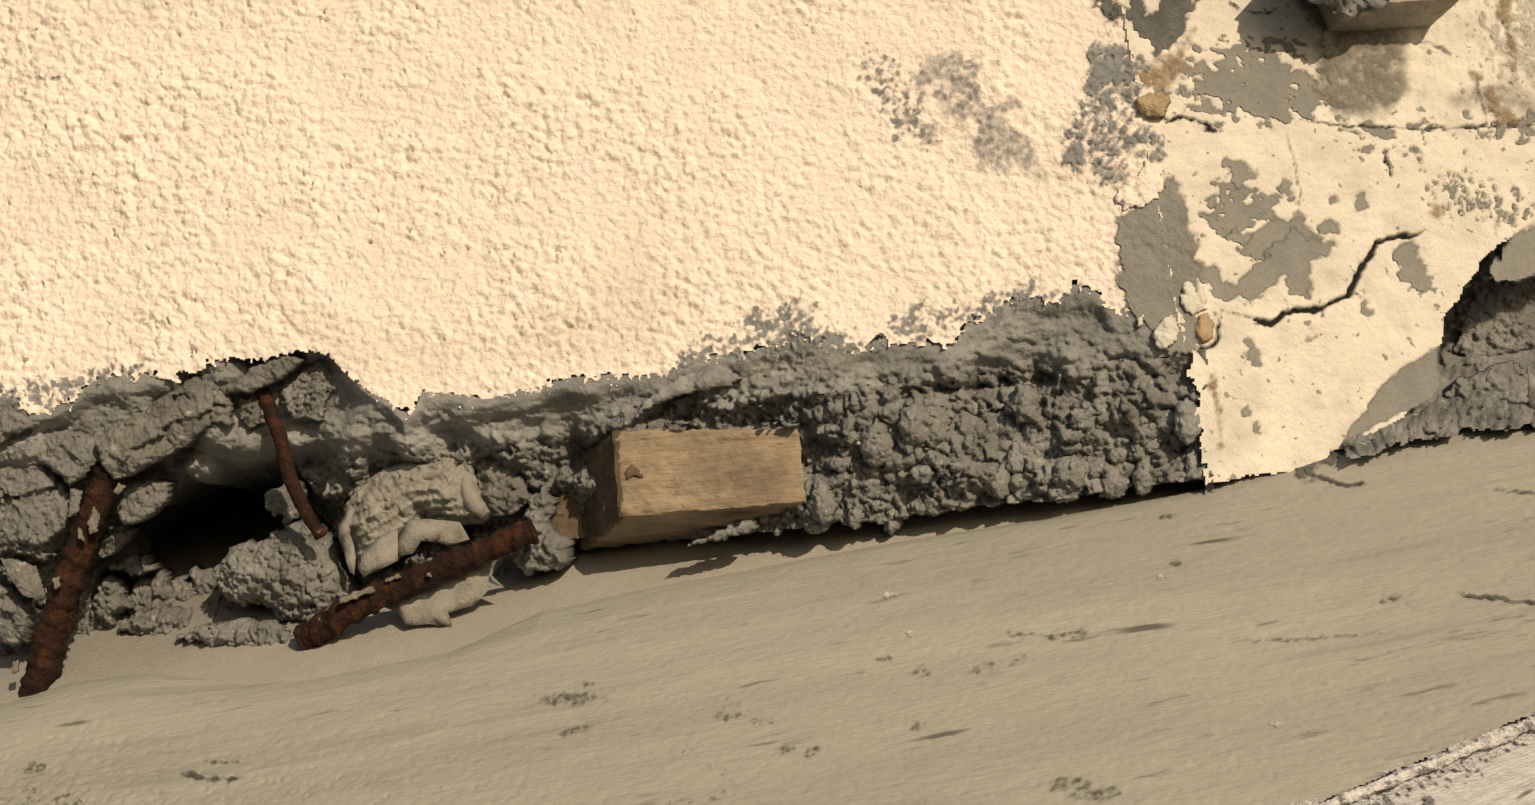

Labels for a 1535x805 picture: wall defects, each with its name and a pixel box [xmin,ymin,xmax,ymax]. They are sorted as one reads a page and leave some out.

peeling [858,42,1042,177]
peeling [0,363,151,417]
peeling [676,279,1069,387]
spalling [1062,0,1535,478]
crack [1198,226,1423,351]
spalling [256,387,327,540]
spalling [0,466,127,698]
spalling [1291,716,1535,805]